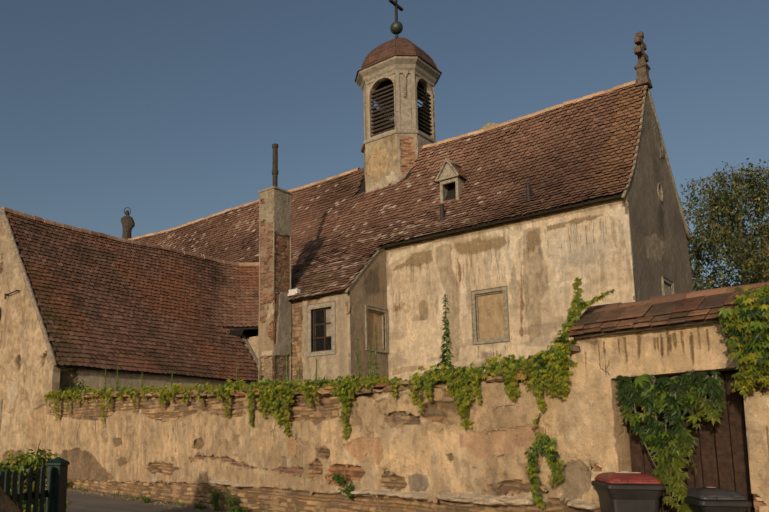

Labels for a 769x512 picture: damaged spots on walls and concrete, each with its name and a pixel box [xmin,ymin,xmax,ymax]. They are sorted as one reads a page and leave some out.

spalling [0,219,344,466]
water stain [653,328,709,364]
spalling [60,436,602,512]